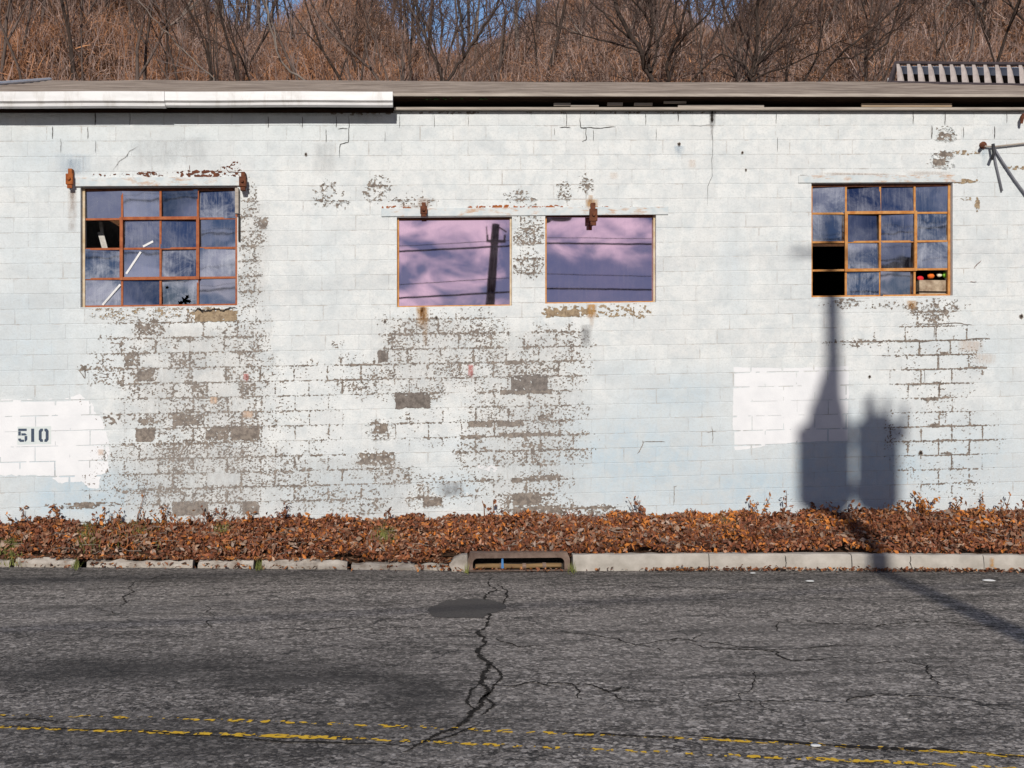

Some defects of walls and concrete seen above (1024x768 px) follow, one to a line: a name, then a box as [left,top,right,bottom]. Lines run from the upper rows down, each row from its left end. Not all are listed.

crack [554,113,614,141]
peeling [45,161,651,522]
peeling [818,297,1006,498]
crack [0,578,523,752]
crack [537,682,637,691]